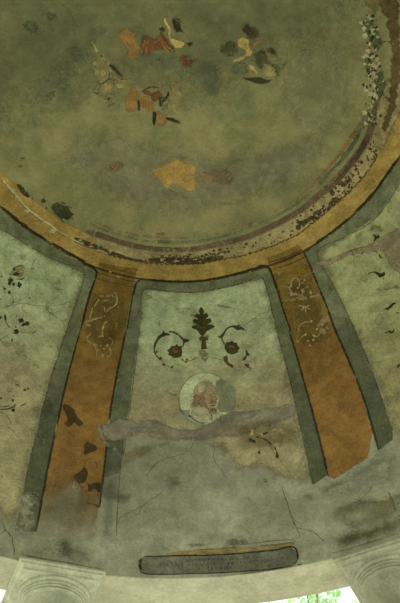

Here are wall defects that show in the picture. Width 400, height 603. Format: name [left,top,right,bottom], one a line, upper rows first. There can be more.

peeling [151,157,213,198]
peeling [3,180,84,245]
crack [282,489,324,541]
water stain [339,521,397,544]